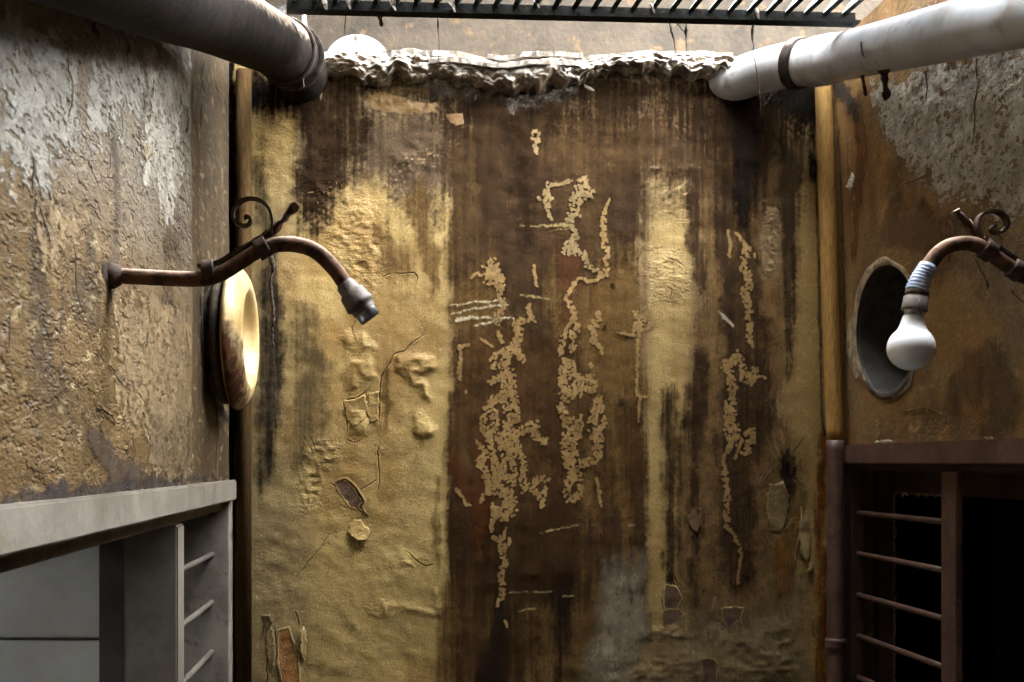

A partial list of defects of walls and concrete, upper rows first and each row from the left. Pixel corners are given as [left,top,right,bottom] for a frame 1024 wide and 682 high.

peeling [0,0,192,277]
peeling [870,48,1024,260]
peeling [956,251,1024,371]
crack [341,321,435,496]
water stain [322,79,815,682]
spalling [262,614,307,682]
spalling [329,477,370,542]
crack [404,549,439,568]
spalling [660,583,685,628]
peeling [766,481,813,573]